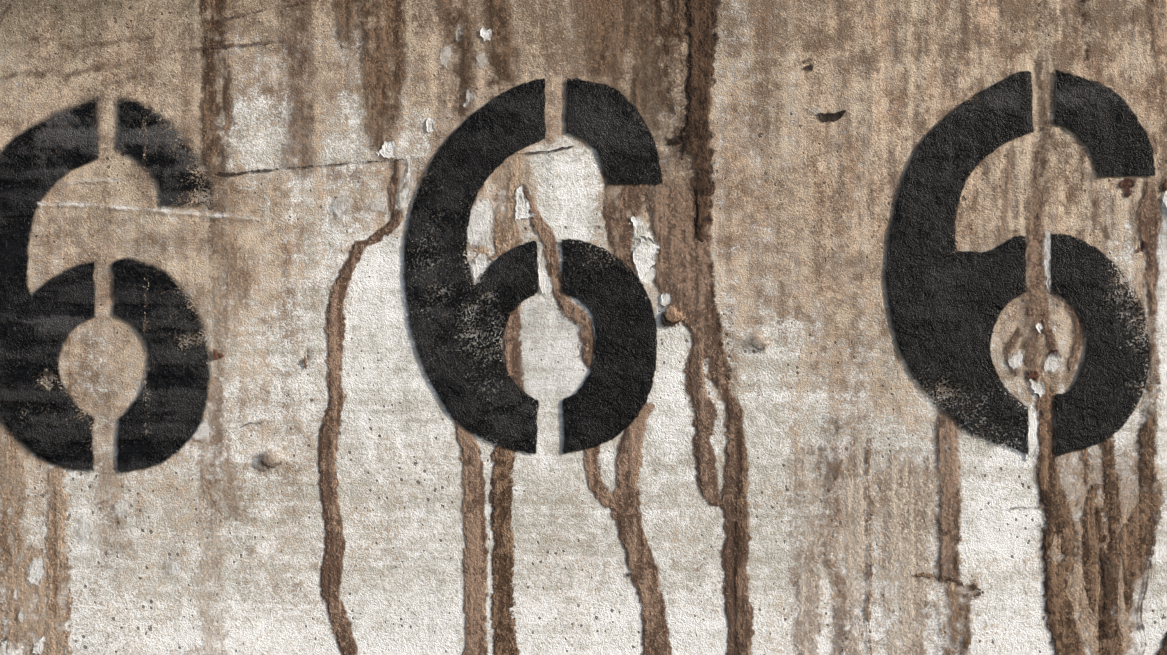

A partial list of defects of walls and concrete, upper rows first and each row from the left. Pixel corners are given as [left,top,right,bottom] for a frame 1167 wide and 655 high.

leakage [281,0,312,171]
crack [218,159,403,177]
rust [318,160,410,655]
leakage [332,0,407,150]
leakage [435,0,520,116]
rust [502,295,525,398]
peeling [629,216,660,280]
rust [645,0,755,655]
rust [1003,159,1167,655]
leakage [0,418,73,655]
rust [451,411,521,655]
rust [583,403,672,655]